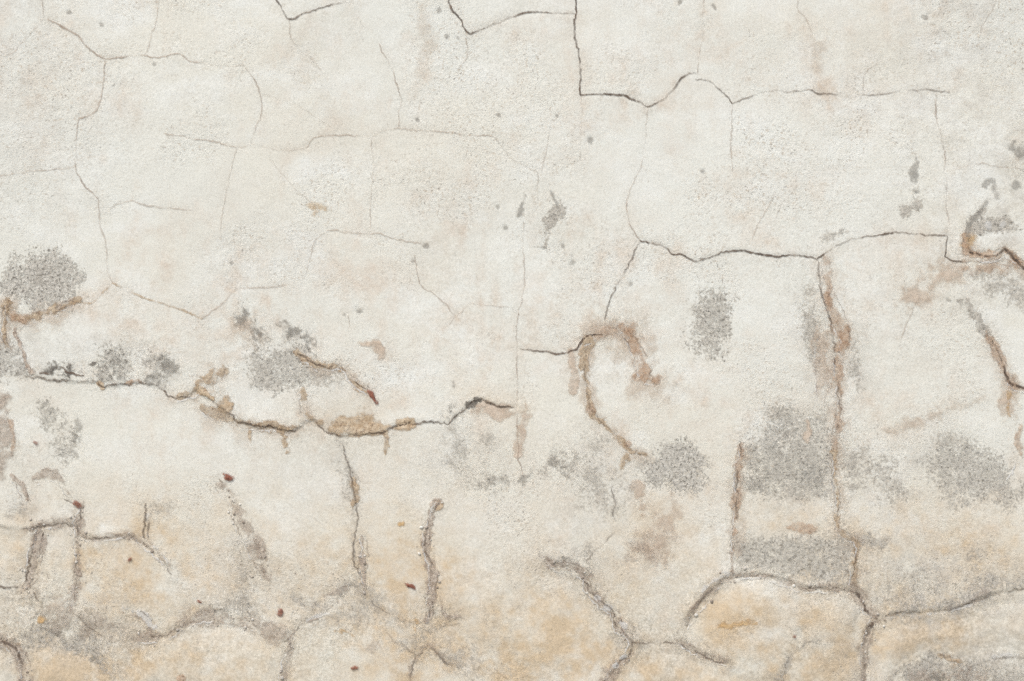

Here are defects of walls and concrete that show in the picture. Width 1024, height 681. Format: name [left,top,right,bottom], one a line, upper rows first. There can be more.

crack [450,5,484,35]
crack [516,0,744,107]
crack [628,231,824,265]
crack [862,232,963,262]
crack [523,292,647,515]
corrosion [620,324,659,384]
crack [957,293,1024,413]
crack [0,505,169,599]
crack [31,340,532,680]
crack [667,420,1024,681]
crack [0,637,33,681]
crack [545,545,640,681]